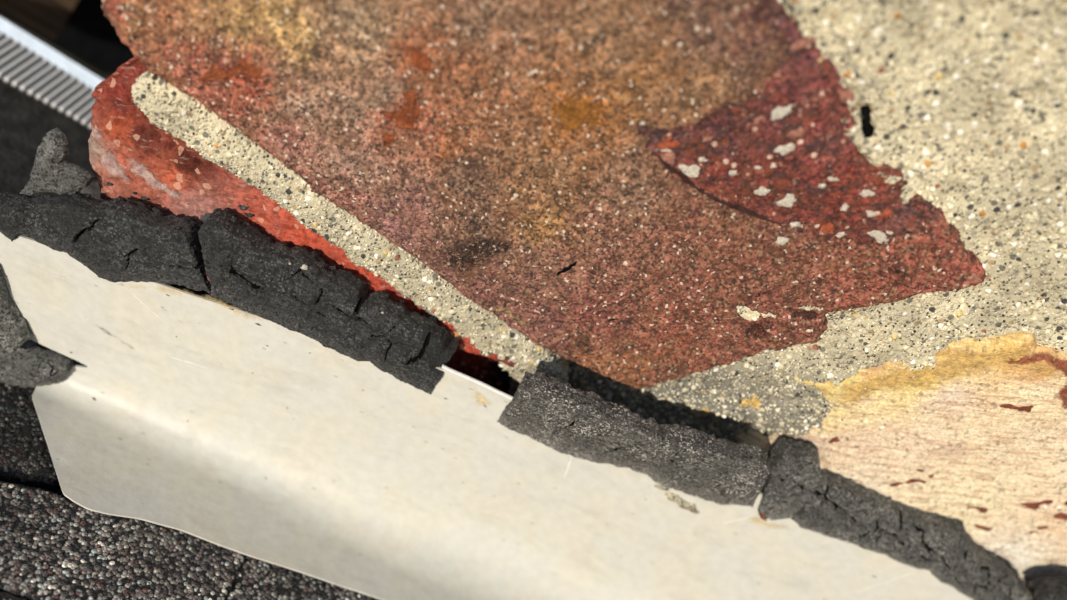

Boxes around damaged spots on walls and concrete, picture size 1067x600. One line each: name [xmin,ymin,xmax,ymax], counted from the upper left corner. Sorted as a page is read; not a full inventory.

spalling [629,0,942,246]
crack [77,218,104,240]
crack [175,263,261,289]
crack [286,265,431,365]
spalling [794,305,825,332]
crack [779,463,1011,600]